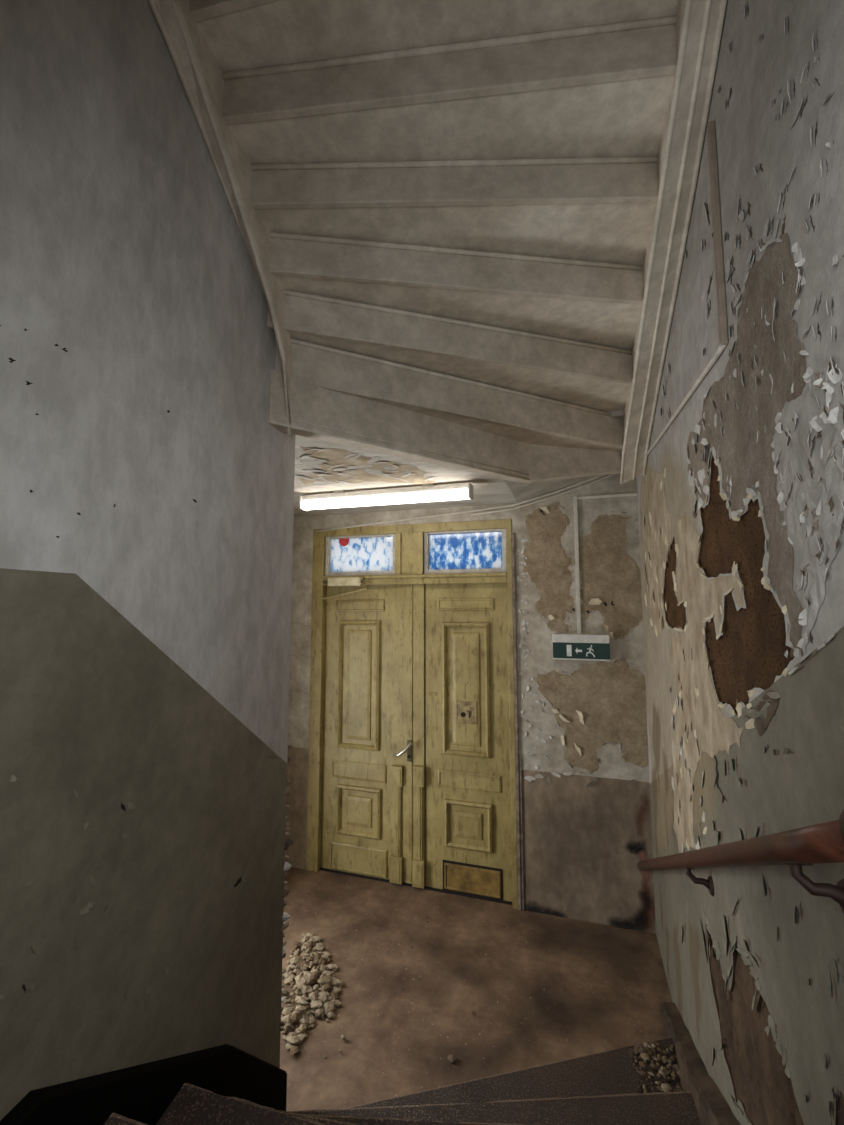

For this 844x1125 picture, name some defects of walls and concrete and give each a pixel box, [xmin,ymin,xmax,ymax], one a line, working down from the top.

peeling [770,33,835,177]
peeling [521,164,844,853]
spalling [700,896,806,1125]
peeling [831,1087,844,1125]